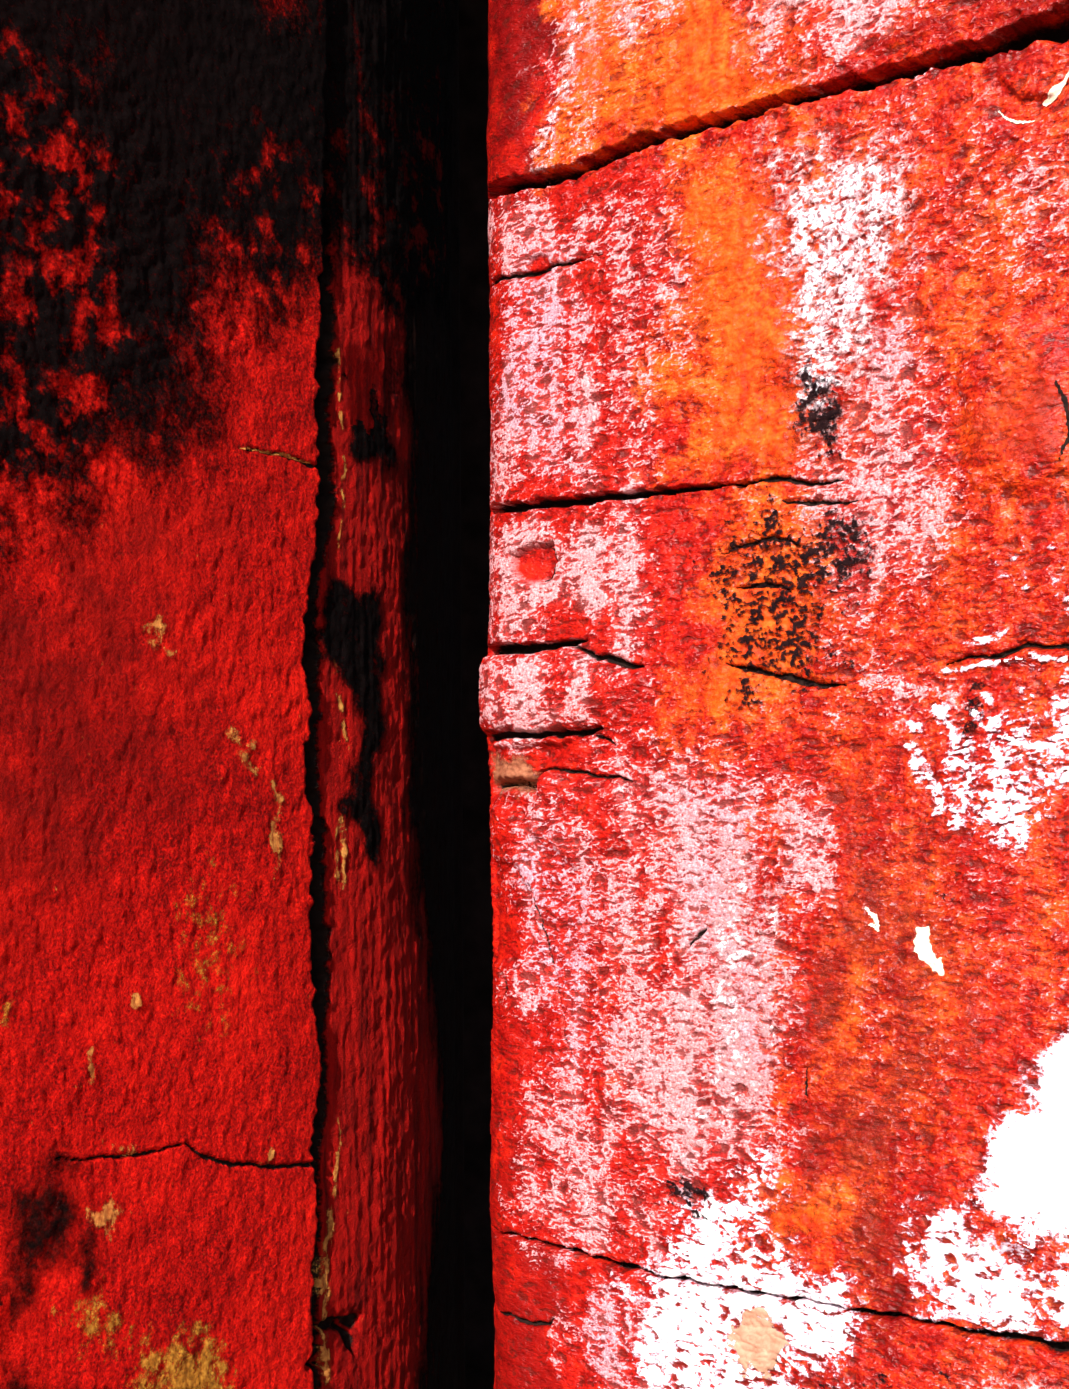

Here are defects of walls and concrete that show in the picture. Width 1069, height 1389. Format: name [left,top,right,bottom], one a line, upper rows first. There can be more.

crack [782,499,858,507]
crack [497,640,645,669]
crack [727,663,847,689]
crack [55,234,358,1389]
spalling [865,907,880,931]
spalling [913,926,944,976]
peeling [670,809,789,1156]
peeling [893,1030,1069,1341]
peeling [610,1133,867,1389]
flaking render [75,1296,237,1389]
crack [500,1311,555,1326]
water stain [0,1349,28,1389]